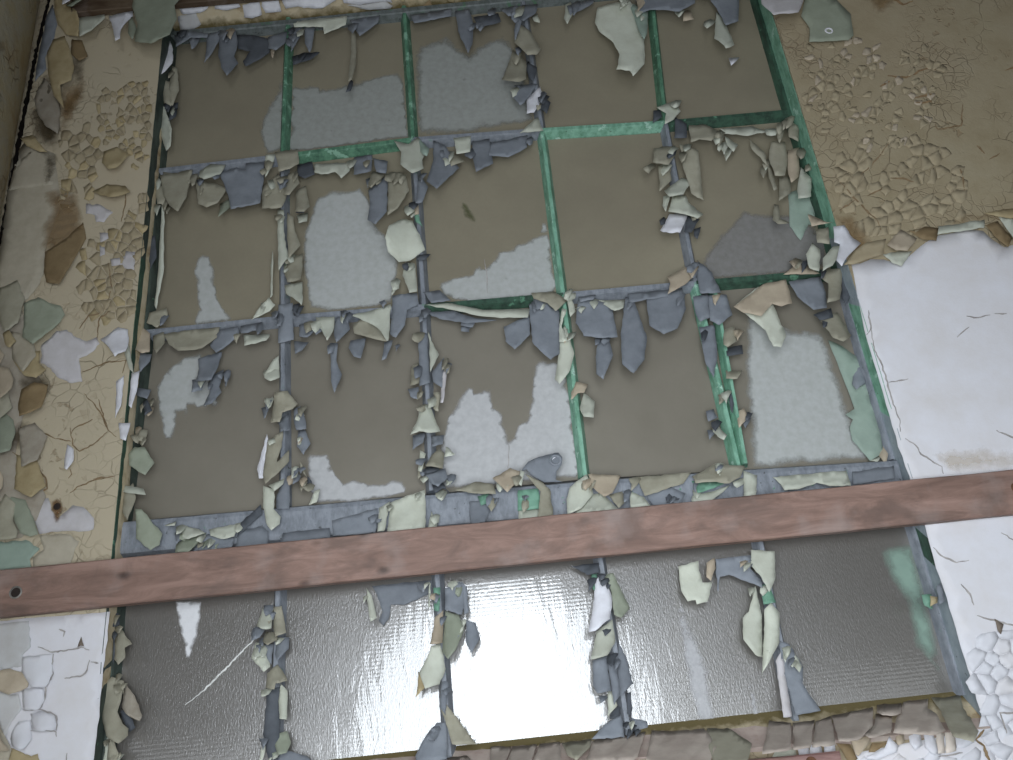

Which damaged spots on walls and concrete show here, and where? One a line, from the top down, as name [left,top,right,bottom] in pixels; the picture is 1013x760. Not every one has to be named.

crack [880,68,963,130]
crack [840,144,914,230]
flaking render [0,0,1013,570]
crack [866,310,944,474]
crack [957,313,1007,337]
flaking render [0,612,142,760]
peeling [251,605,310,760]
peeling [363,580,480,760]
peeling [572,563,648,739]
peeling [678,550,821,717]
flaking render [772,516,1013,760]
crack [933,547,1013,626]